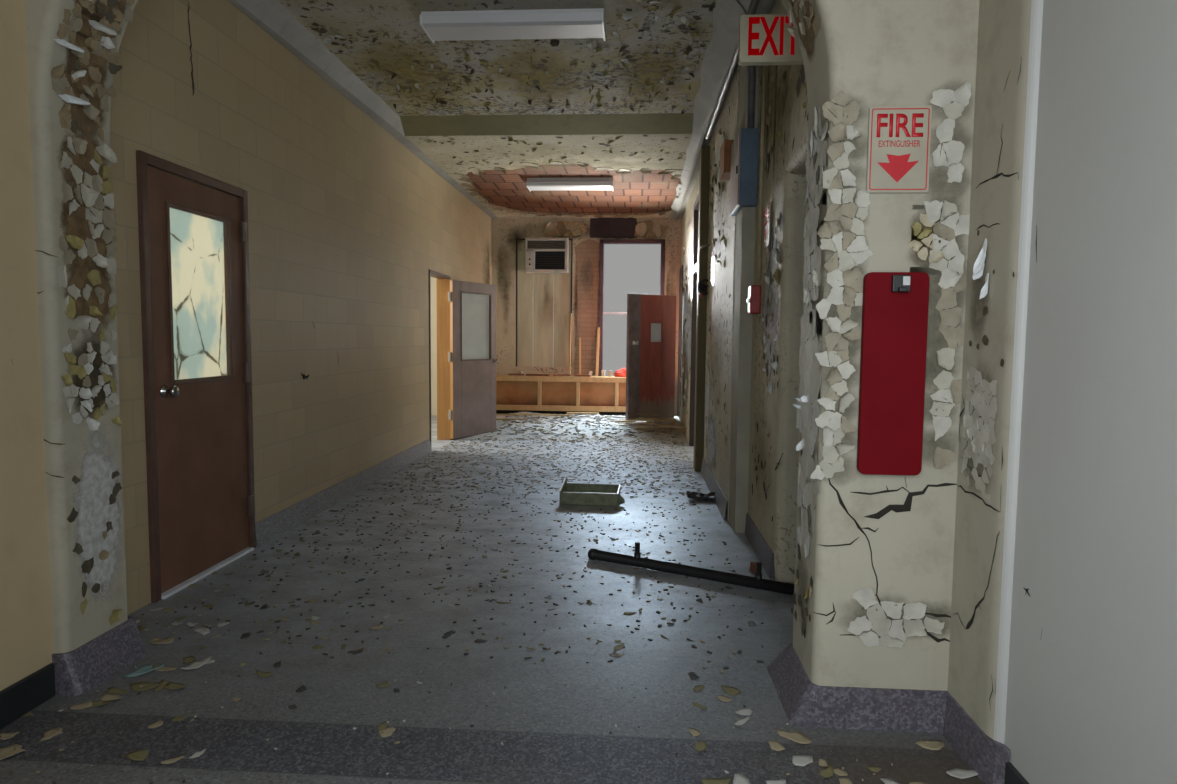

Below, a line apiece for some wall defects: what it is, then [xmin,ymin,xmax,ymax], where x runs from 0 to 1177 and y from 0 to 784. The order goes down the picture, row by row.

peeling [300,0,715,117]
flaking render [427,136,689,218]
peeling [709,129,727,274]
peeling [51,0,135,614]
peeling [706,286,731,467]
peeling [907,81,997,505]
crack [808,451,1003,643]